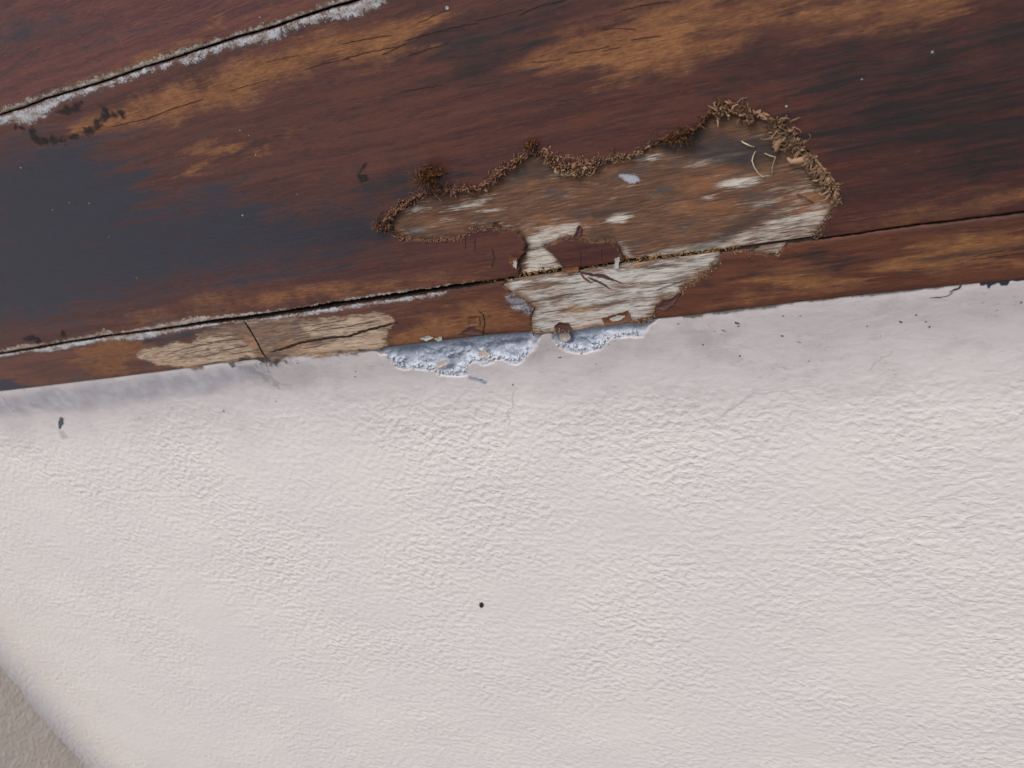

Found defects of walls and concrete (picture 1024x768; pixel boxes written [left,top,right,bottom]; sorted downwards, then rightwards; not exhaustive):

water stain [0,0,386,145]
peeling [563,257,623,289]